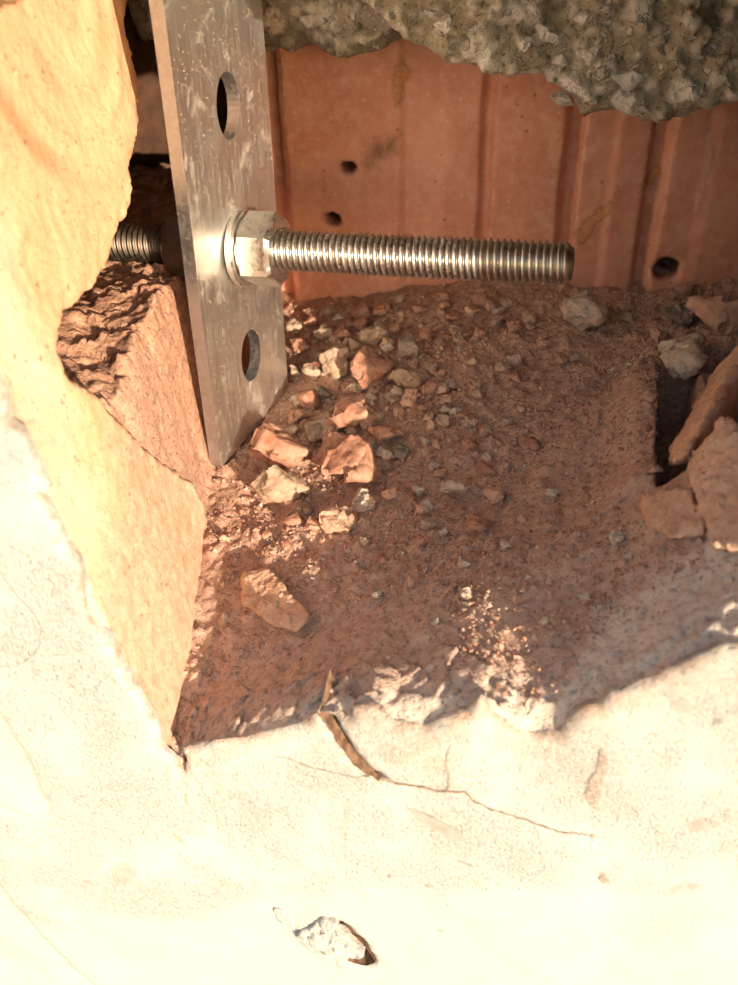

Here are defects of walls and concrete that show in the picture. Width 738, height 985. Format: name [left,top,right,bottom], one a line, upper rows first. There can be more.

crack [274,669,606,844]
flaking render [273,907,375,967]